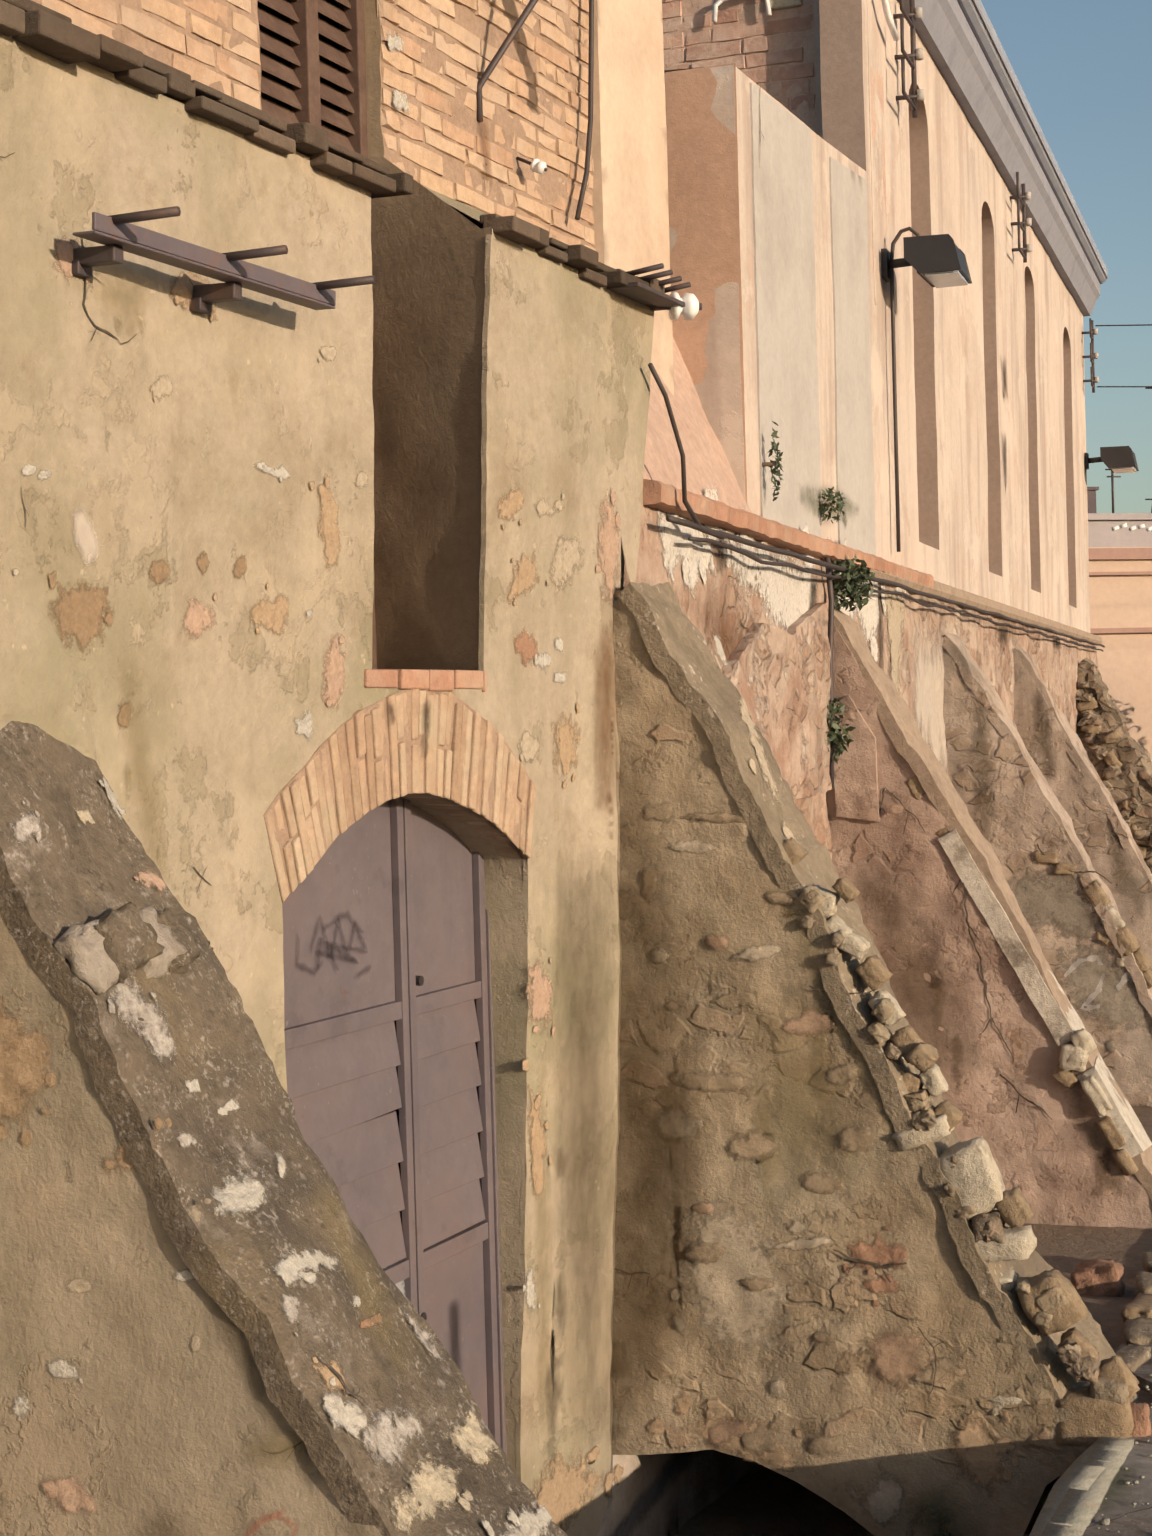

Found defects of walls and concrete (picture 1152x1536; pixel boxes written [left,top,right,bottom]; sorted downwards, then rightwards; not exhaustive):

flaking render [170,271,209,309]
spalling [309,476,340,567]
spalling [508,490,621,606]
spalling [48,571,113,650]
spalling [517,703,580,789]
crack [952,879,1052,1120]
flaking render [532,1446,623,1531]